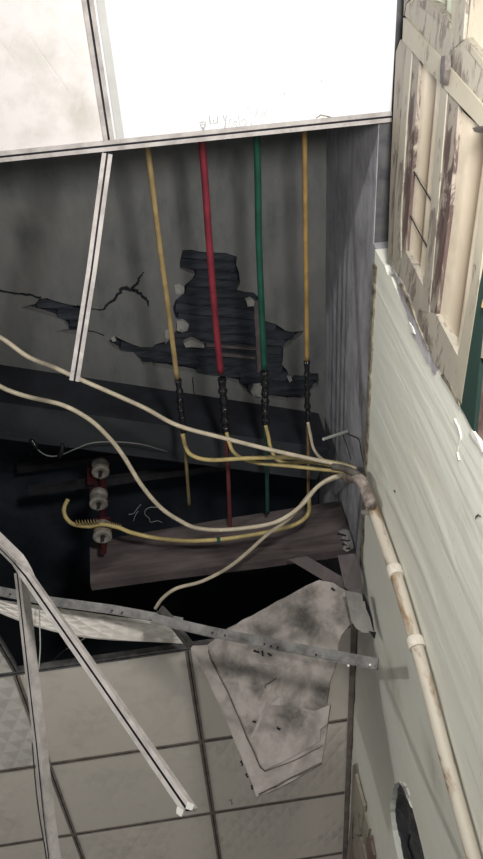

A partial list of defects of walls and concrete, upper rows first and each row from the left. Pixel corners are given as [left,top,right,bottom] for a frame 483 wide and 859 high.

crack [0,290,41,299]
crack [77,272,149,336]
spalling [111,250,318,398]